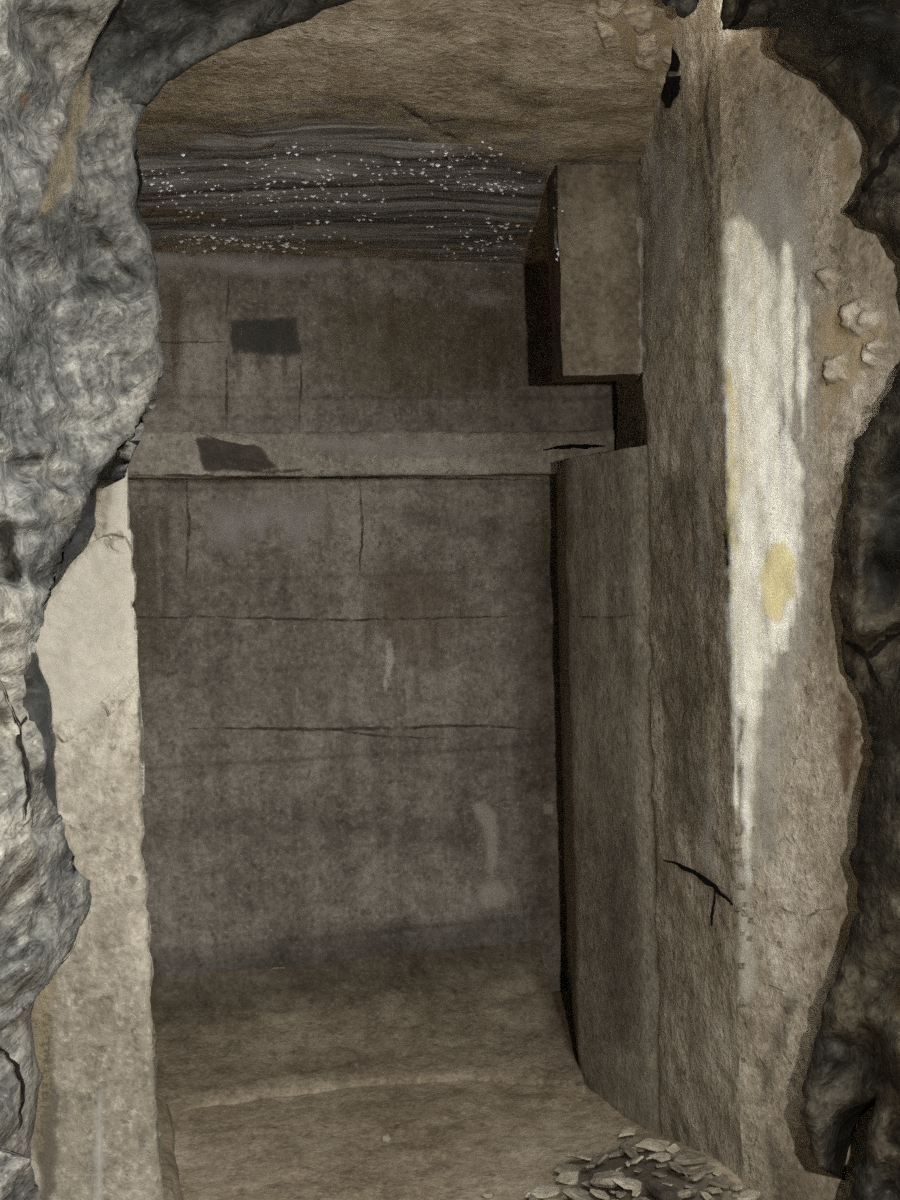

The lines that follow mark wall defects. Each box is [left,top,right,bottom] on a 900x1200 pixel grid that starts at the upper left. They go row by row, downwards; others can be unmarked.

damp [137,118,563,275]
damp [716,186,895,880]
crack [663,860,733,926]